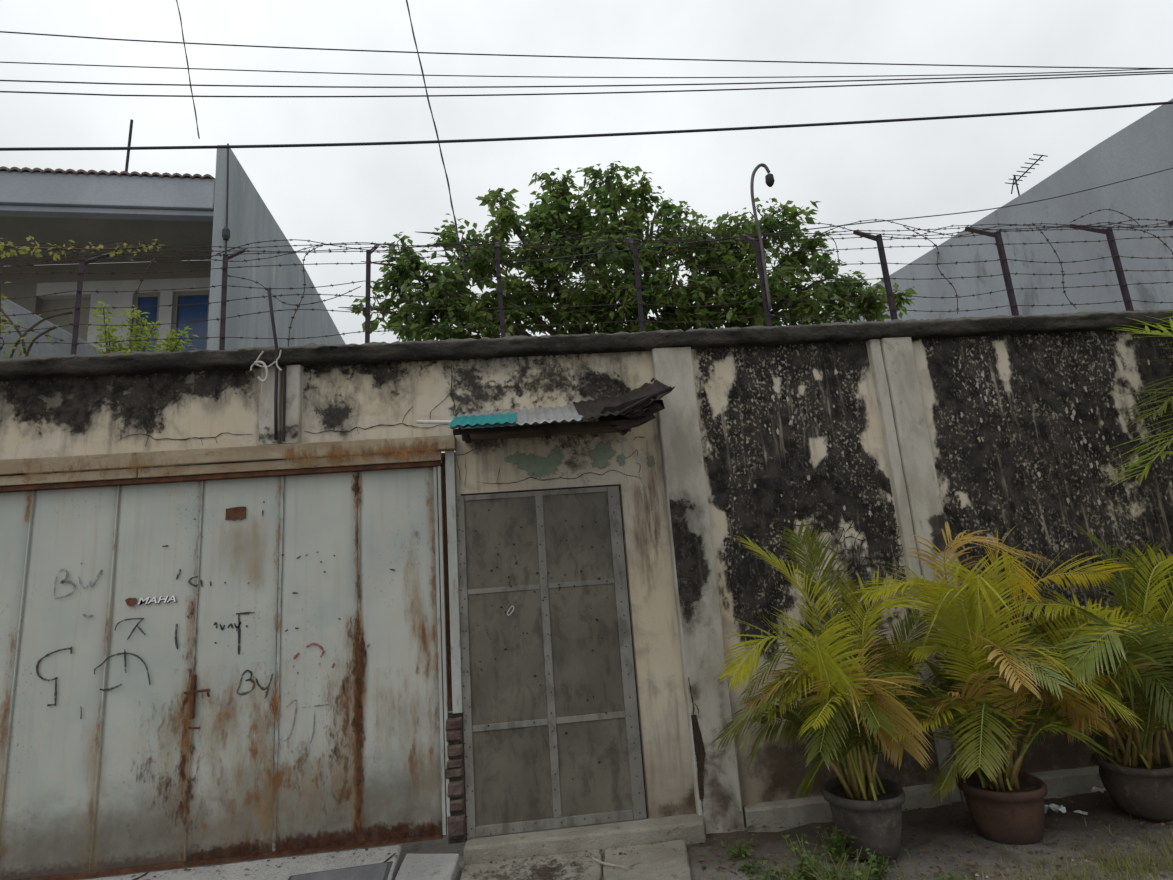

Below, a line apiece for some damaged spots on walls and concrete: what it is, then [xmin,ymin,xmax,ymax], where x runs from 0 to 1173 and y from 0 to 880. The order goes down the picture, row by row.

water stain [0,369,254,438]
crack [120,433,249,446]
water stain [314,395,352,434]
water stain [303,353,632,416]
peeling [505,446,564,478]
peeling [589,442,625,469]
water stain [669,341,913,661]
water stain [912,327,1173,663]
corrosion [329,443,453,725]
corrosion [131,638,204,832]
corrosion [182,611,441,862]